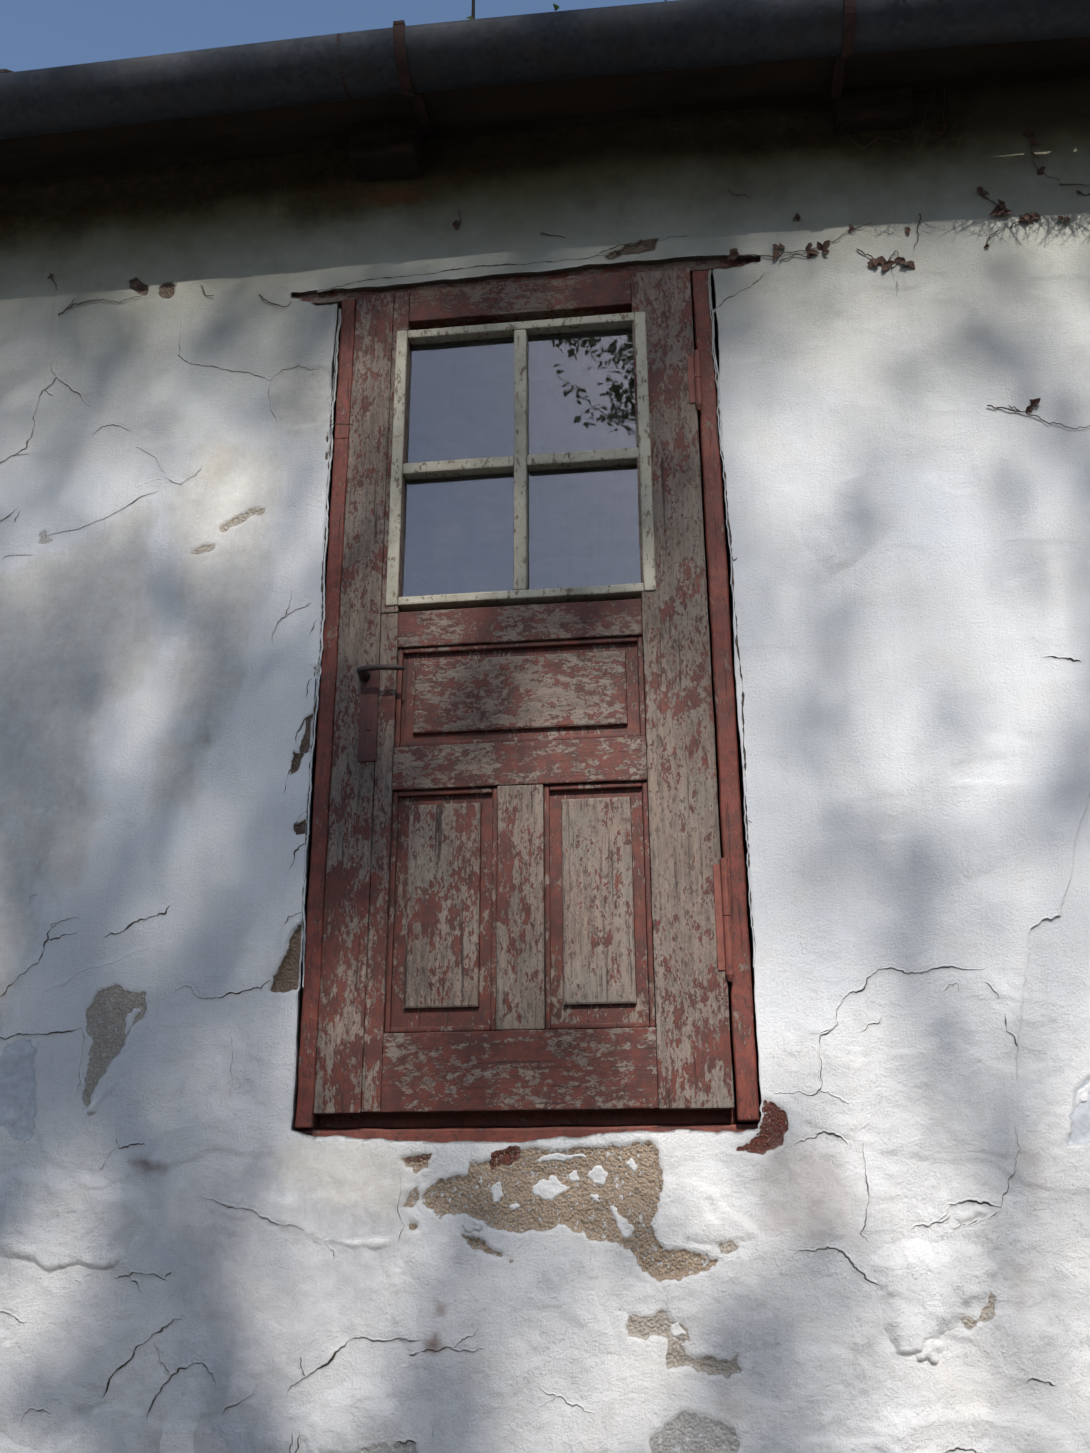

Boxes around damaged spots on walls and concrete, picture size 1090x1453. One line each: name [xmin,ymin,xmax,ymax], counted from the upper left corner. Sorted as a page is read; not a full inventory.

crack [0,361,203,559]
crack [1042,655,1082,663]
crack [0,893,171,1040]
spalling [271,924,301,993]
peeling [82,984,146,1106]
crack [775,782,1090,1285]
spalling [736,1100,789,1155]
spalling [401,1141,739,1282]
crack [102,1317,485,1453]
spalling [619,1309,741,1378]
spalling [650,1412,740,1453]
crack [939,1445,998,1453]